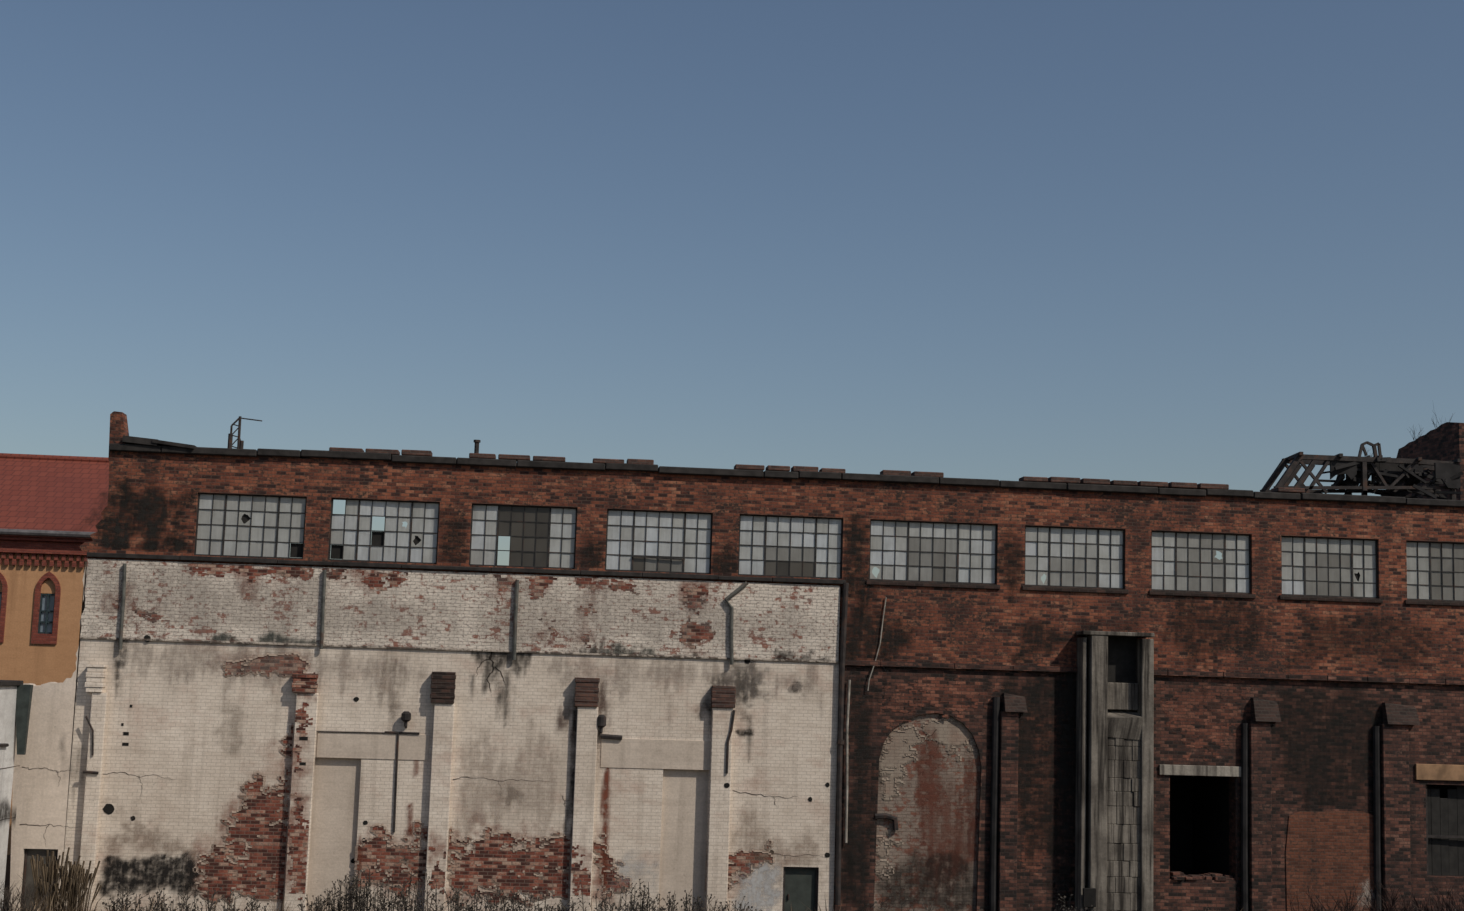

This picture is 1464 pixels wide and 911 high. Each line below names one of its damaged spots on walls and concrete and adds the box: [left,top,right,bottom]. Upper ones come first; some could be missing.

flaking render [493,574,557,600]
flaking render [575,577,640,616]
flaking render [671,583,716,649]
damp [472,651,531,698]
flaking render [193,651,318,905]
flaking render [879,714,976,802]
flaking render [351,820,632,909]
flaking render [727,839,775,892]
flaking render [875,823,904,881]